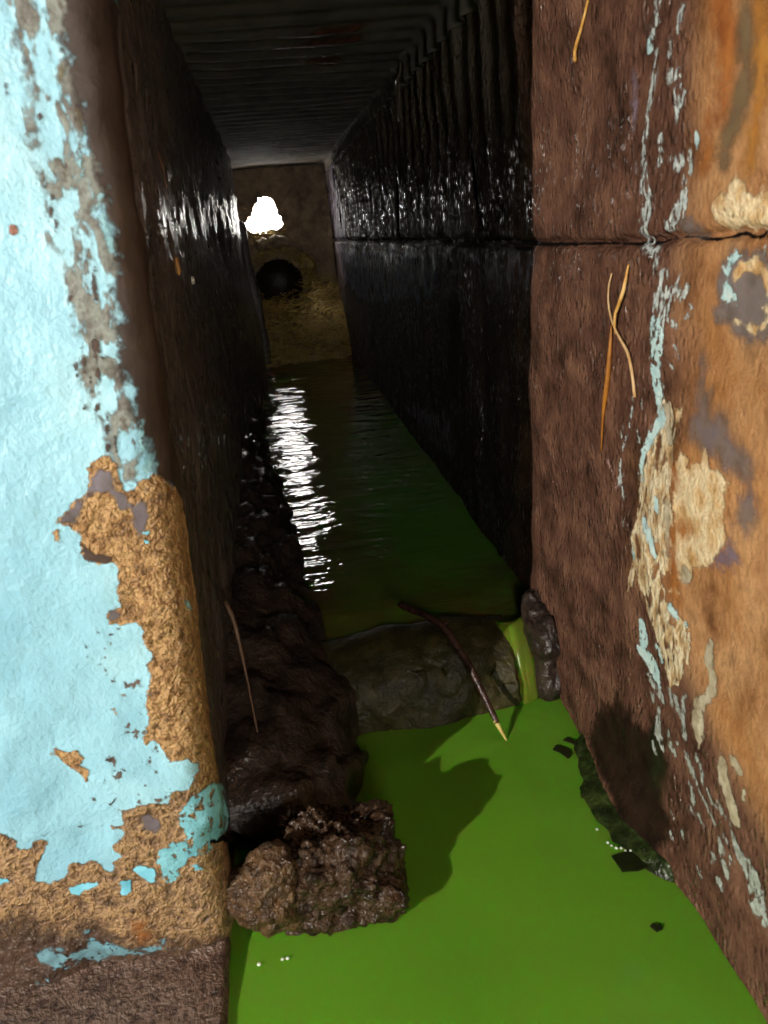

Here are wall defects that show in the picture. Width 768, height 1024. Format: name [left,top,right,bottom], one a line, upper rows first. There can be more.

corrosion [700,0,768,172]
peeling [91,191,115,253]
peeling [713,246,768,343]
peeling [627,395,730,688]
spalling [0,420,239,988]